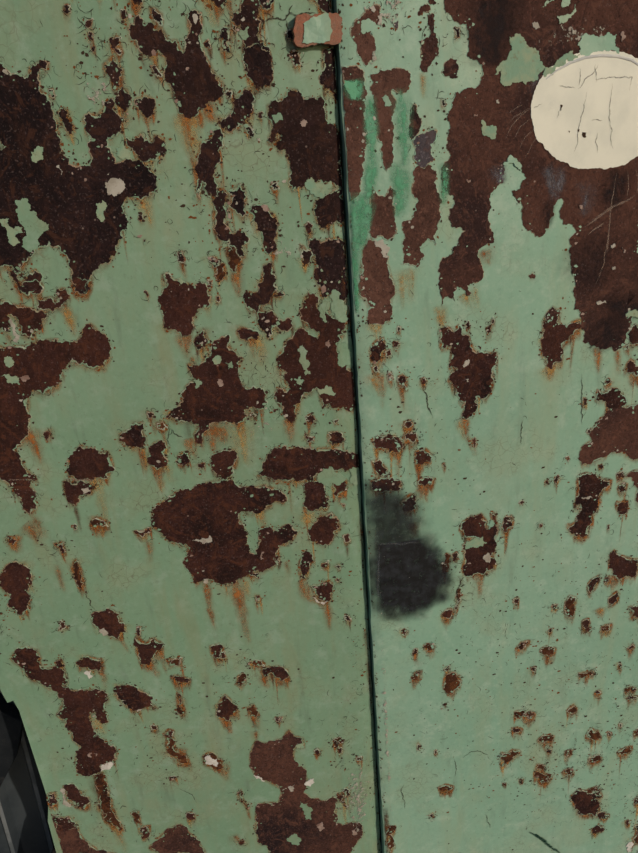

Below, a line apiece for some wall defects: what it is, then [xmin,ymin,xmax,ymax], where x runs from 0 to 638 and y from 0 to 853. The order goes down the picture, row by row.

peeling [150,8,164,27]
peeling [418,0,436,16]
peeling [85,18,96,52]
peeling [109,36,123,62]
rust [127,0,638,625]
peeling [615,471,629,519]
rust [0,561,33,619]
rust [90,608,125,639]
rust [11,646,157,853]
rust [249,730,363,853]
peeling [131,810,151,840]
rust [149,824,205,853]